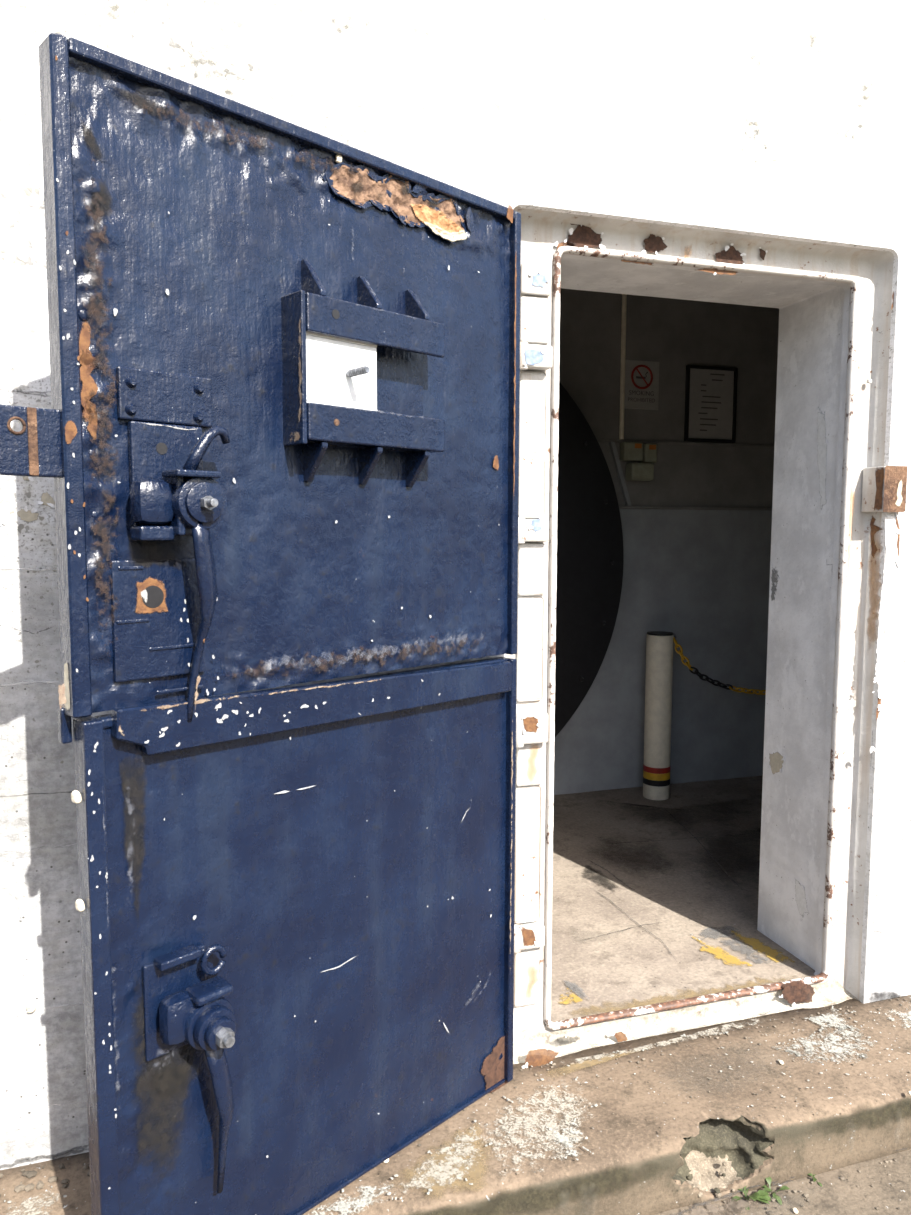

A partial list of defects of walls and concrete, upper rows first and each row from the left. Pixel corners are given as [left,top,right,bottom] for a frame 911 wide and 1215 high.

peeling [322,162,474,244]
rust [65,179,119,627]
peeling [17,492,55,522]
rust [869,466,908,634]
rust [136,577,168,613]
rust [779,980,815,1006]
rust [481,1036,508,1094]
rust [522,1048,558,1069]
peeling [312,997,911,1215]